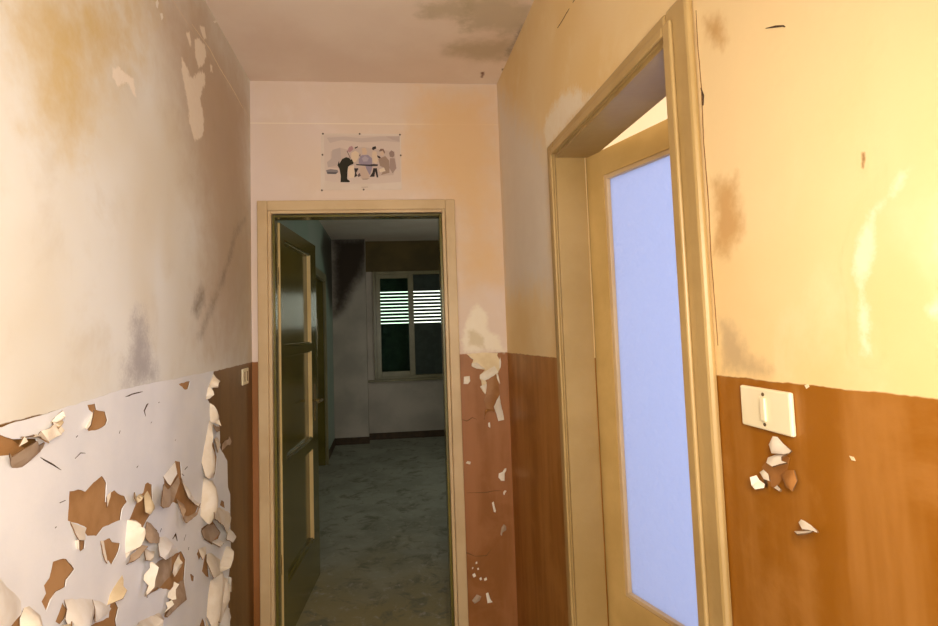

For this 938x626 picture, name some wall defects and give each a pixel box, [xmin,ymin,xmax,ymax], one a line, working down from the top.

peeling [0,371,236,626]
damp [0,0,252,468]
spalling [178,19,217,150]
damp [365,0,556,341]
spalling [459,298,507,427]
peeling [750,436,798,493]
peeling [794,520,819,535]
damp [840,105,938,368]